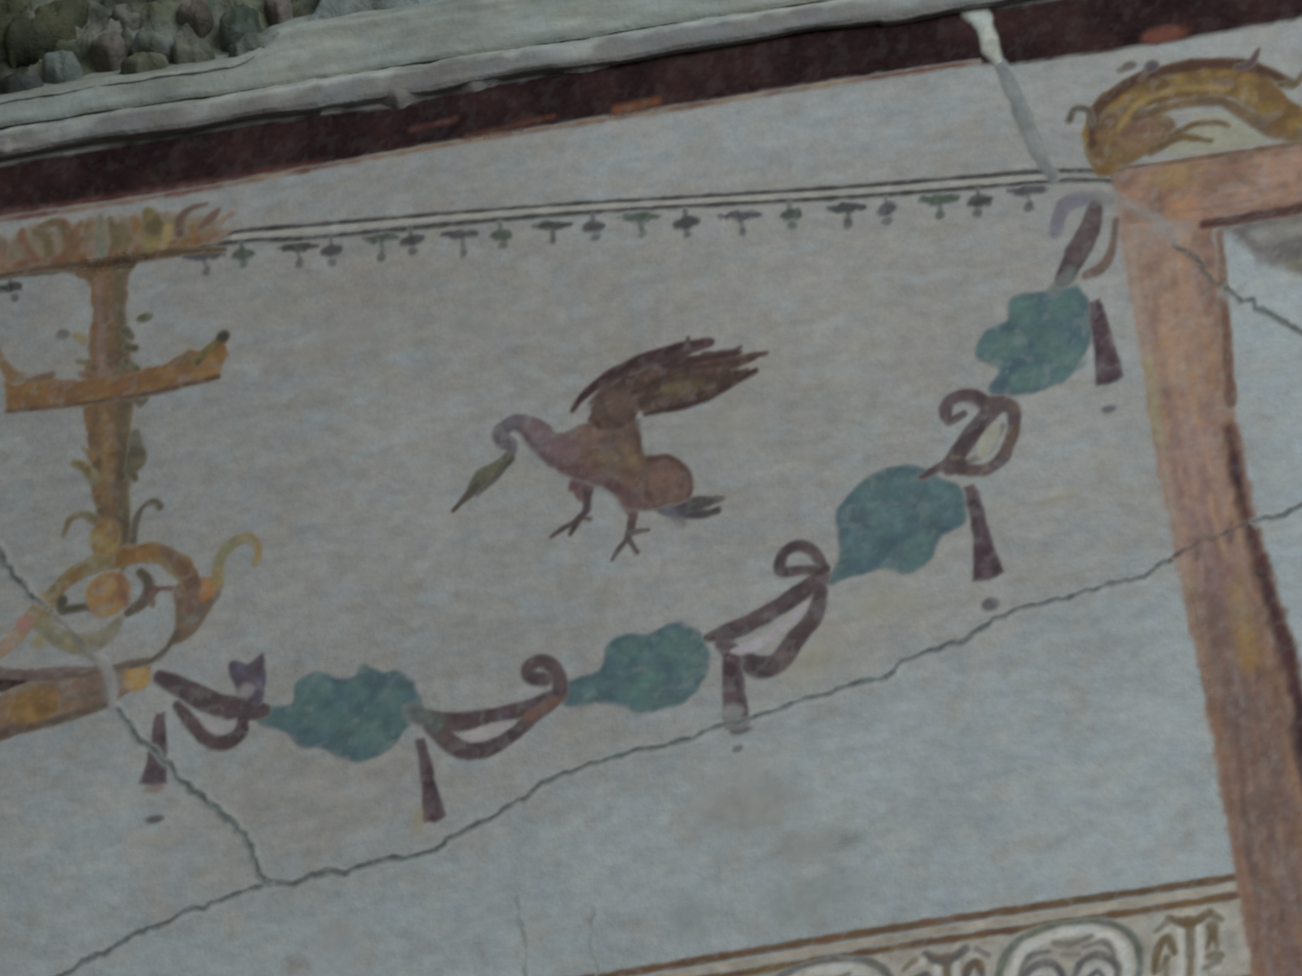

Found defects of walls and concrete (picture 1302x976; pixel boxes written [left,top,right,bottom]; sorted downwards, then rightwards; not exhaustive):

crack [961,7,1059,183]
crack [1174,244,1302,336]
crack [0,502,1302,976]